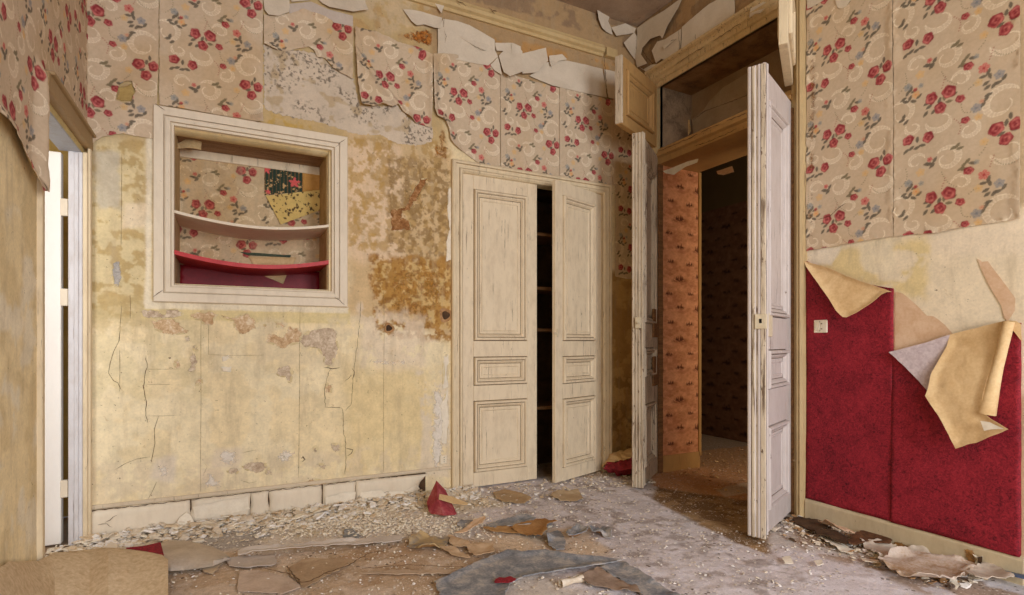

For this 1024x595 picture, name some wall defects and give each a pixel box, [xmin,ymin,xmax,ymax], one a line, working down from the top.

peeling [403,3,444,29]
peeling [597,0,735,71]
flaking render [263,44,433,146]
spalling [139,309,339,386]
crack [92,291,424,527]